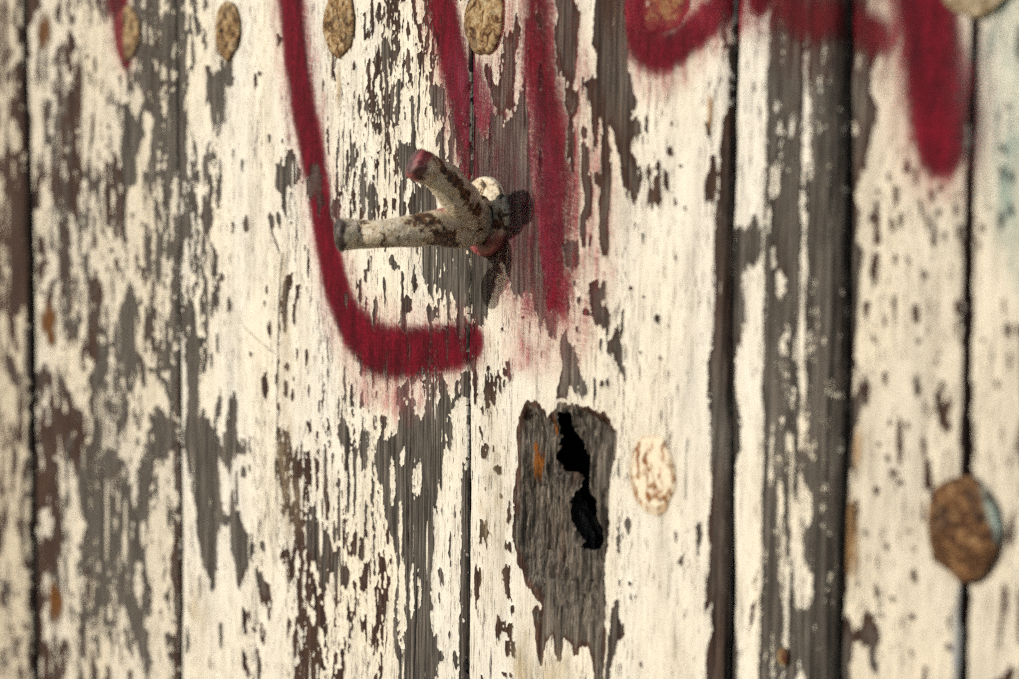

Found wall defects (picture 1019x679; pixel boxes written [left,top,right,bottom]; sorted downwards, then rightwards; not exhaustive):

peeling [0,0,687,679]
peeling [674,0,1019,679]